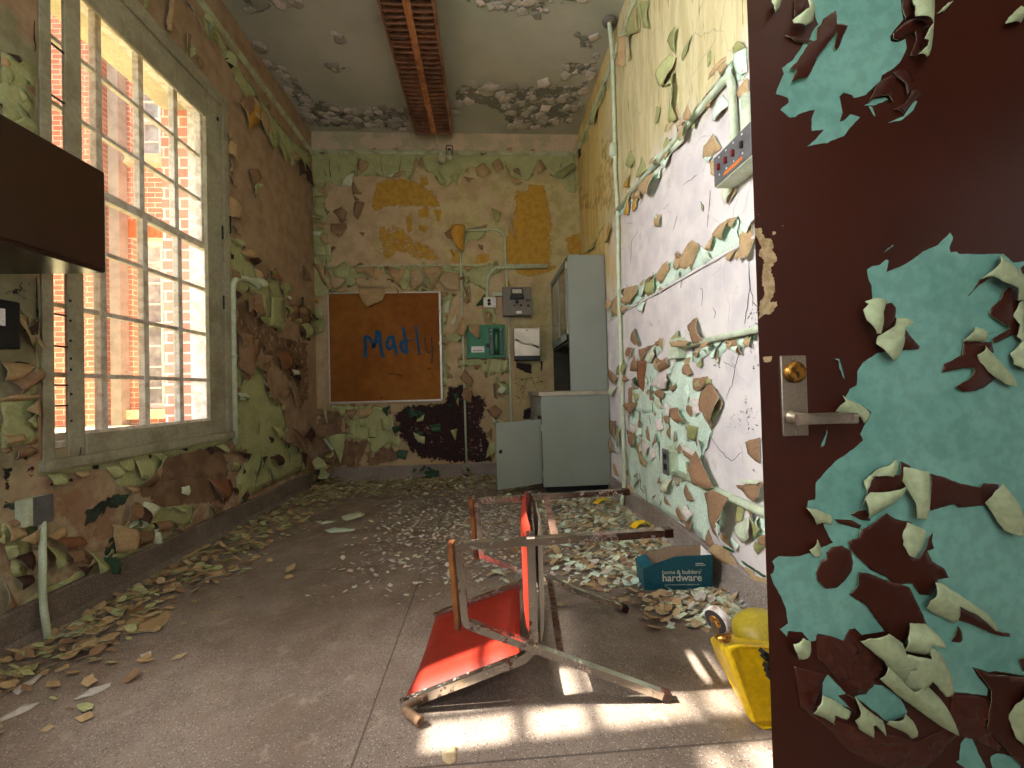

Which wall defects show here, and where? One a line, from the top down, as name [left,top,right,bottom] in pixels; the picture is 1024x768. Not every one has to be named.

peeling [566,26,749,255]
peeling [776,0,954,146]
peeling [1005,6,1024,24]
peeling [0,0,661,612]
peeling [605,214,783,319]
peeling [607,233,1024,768]